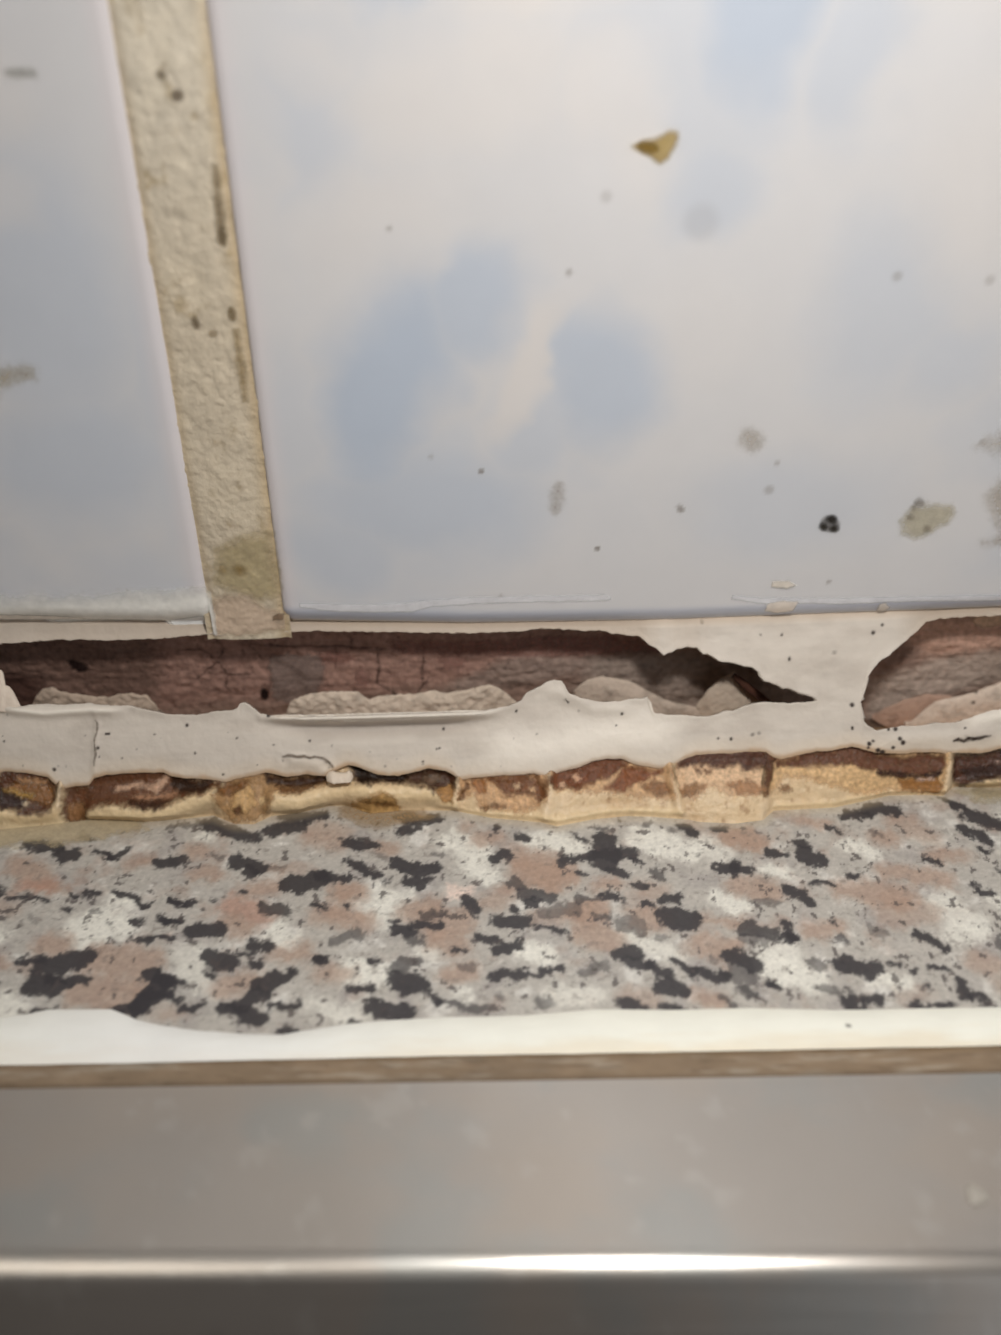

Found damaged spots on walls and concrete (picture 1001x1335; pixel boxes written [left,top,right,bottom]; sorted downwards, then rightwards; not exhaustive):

peeling [0,591,217,635]
peeling [300,595,610,612]
peeling [732,581,1001,628]
flaking render [69,660,88,671]
flaking render [261,652,369,702]
peeling [392,636,657,668]